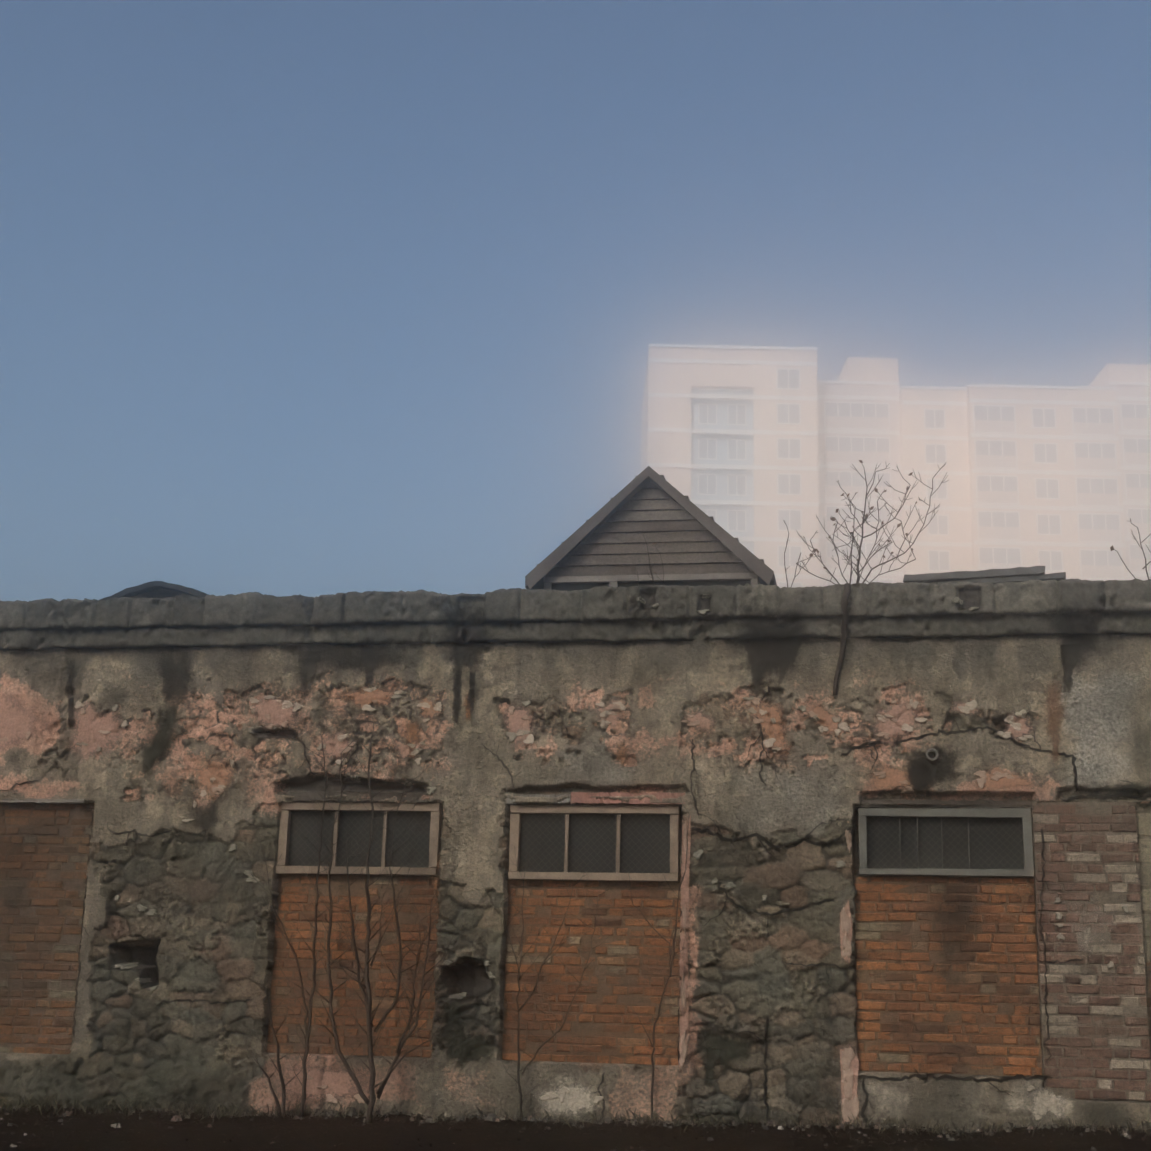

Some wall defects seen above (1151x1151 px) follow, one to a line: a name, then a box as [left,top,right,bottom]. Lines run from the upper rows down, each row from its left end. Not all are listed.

leakage [740,606,806,694]
leakage [1051,603,1100,691]
peeling [70,701,129,760]
leakage [142,652,193,772]
peeling [248,695,303,739]
spalling [283,733,437,795]
peeling [505,701,534,745]
peeling [743,697,788,755]
peeling [875,697,928,743]
crack [840,710,1151,803]
peeling [997,710,1033,741]
crack [858,829,1084,1124]